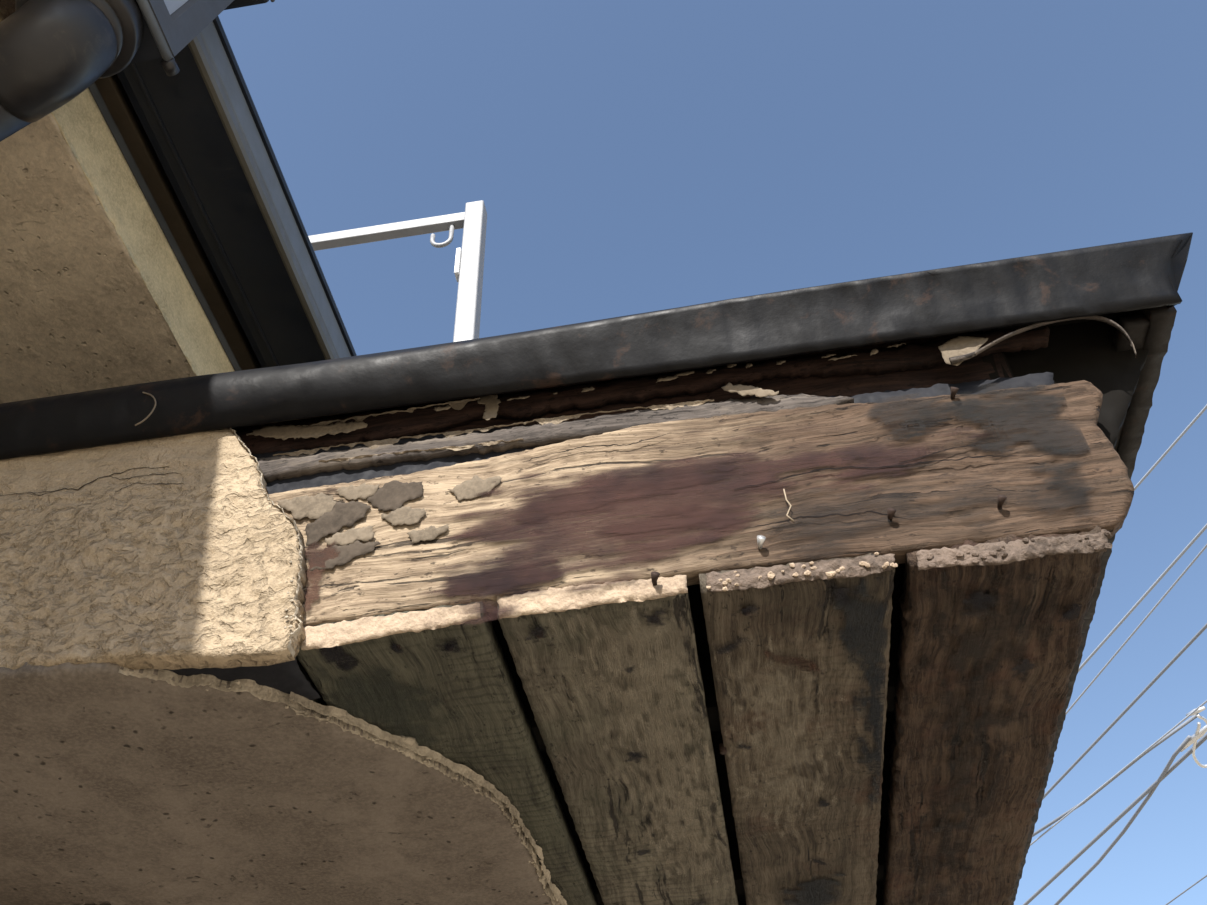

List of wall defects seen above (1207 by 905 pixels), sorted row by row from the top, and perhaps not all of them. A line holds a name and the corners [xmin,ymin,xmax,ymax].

peeling [821,343,905,361]
peeling [938,315,1137,366]
crack [0,466,184,496]
peeling [230,363,779,657]
water stain [430,383,1094,623]
flaking render [118,666,567,905]